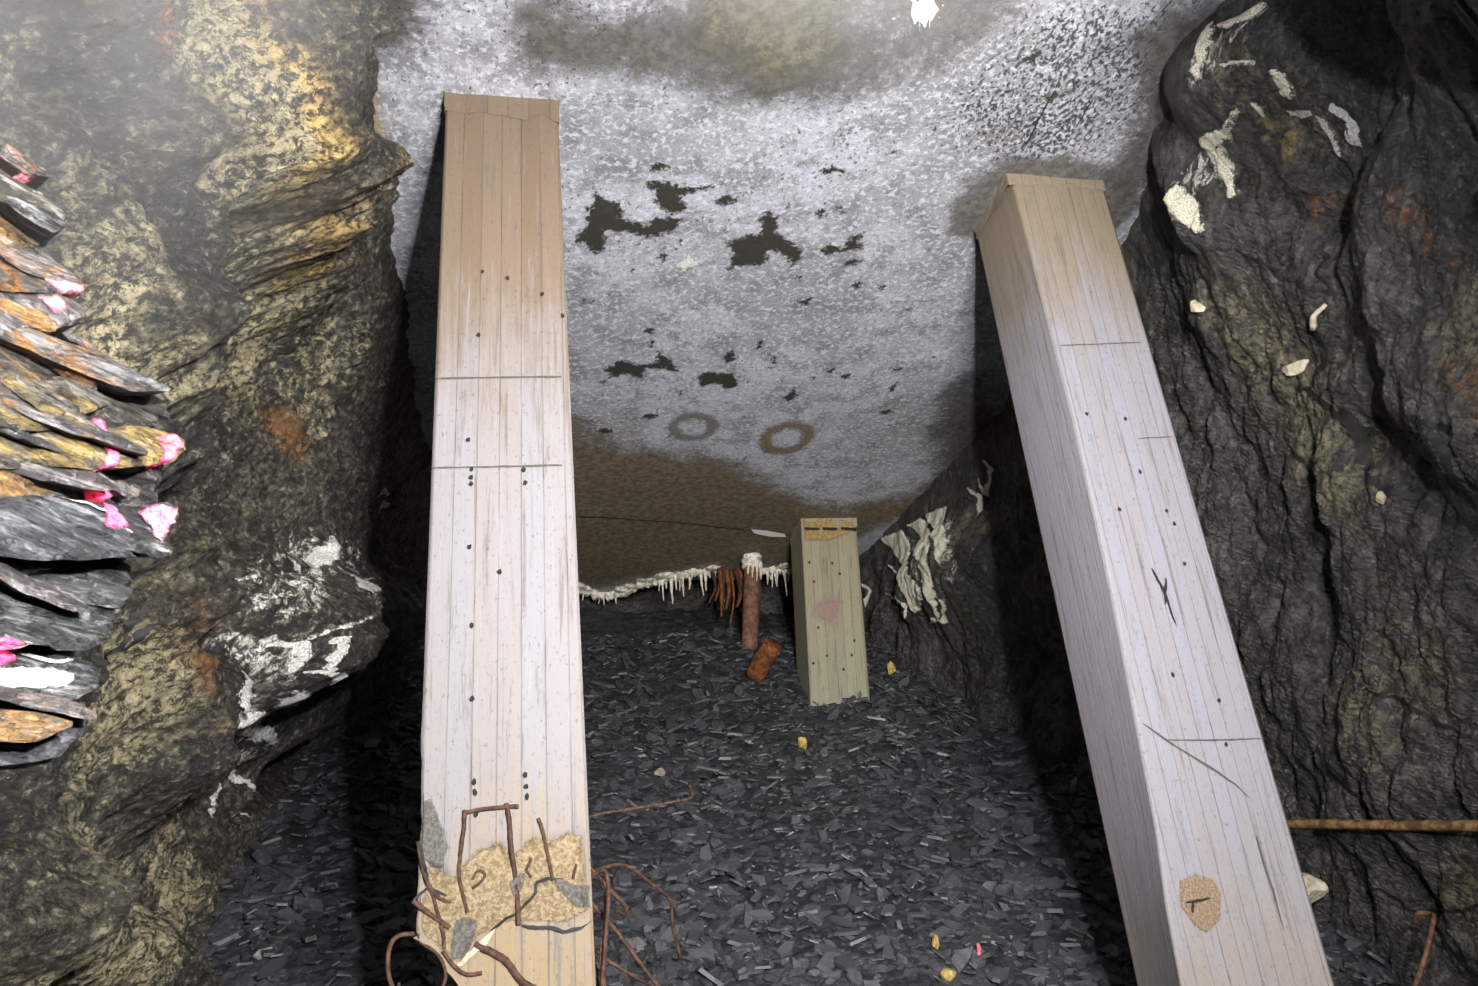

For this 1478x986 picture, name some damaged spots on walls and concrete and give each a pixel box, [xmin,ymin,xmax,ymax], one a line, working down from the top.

damp [514,0,1017,107]
peeling [575,161,738,262]
peeling [724,209,888,290]
peeling [599,327,739,395]
damp [571,372,999,624]
corrosion [708,567,762,627]
spalling [589,784,694,819]
spalling [385,799,682,986]